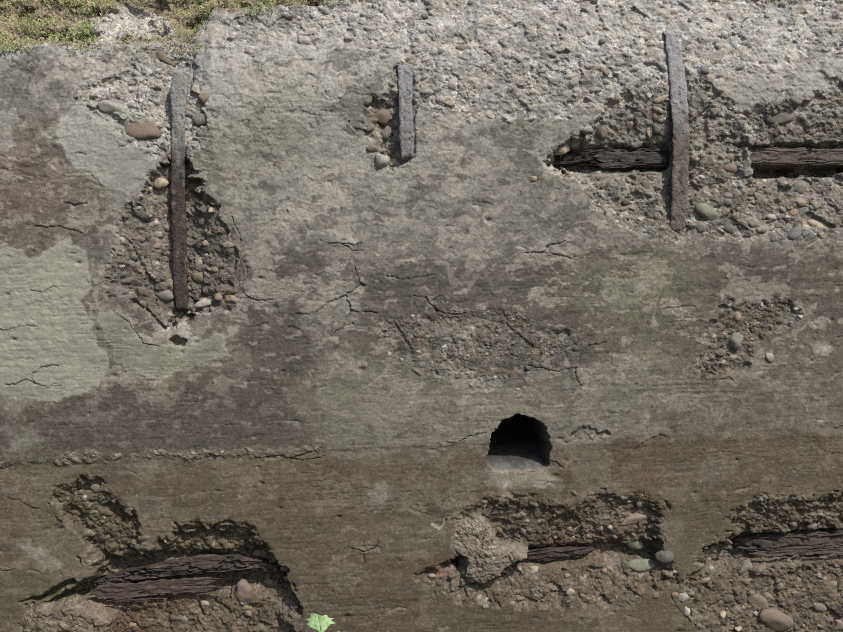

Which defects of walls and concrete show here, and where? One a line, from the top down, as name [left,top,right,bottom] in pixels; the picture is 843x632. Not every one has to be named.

spalling [345,59,426,174]
spalling [538,72,843,254]
spalling [0,48,246,404]
crack [323,242,378,336]
crack [414,296,467,317]
crack [528,364,583,387]
spalling [23,518,306,632]
spalling [412,487,843,632]